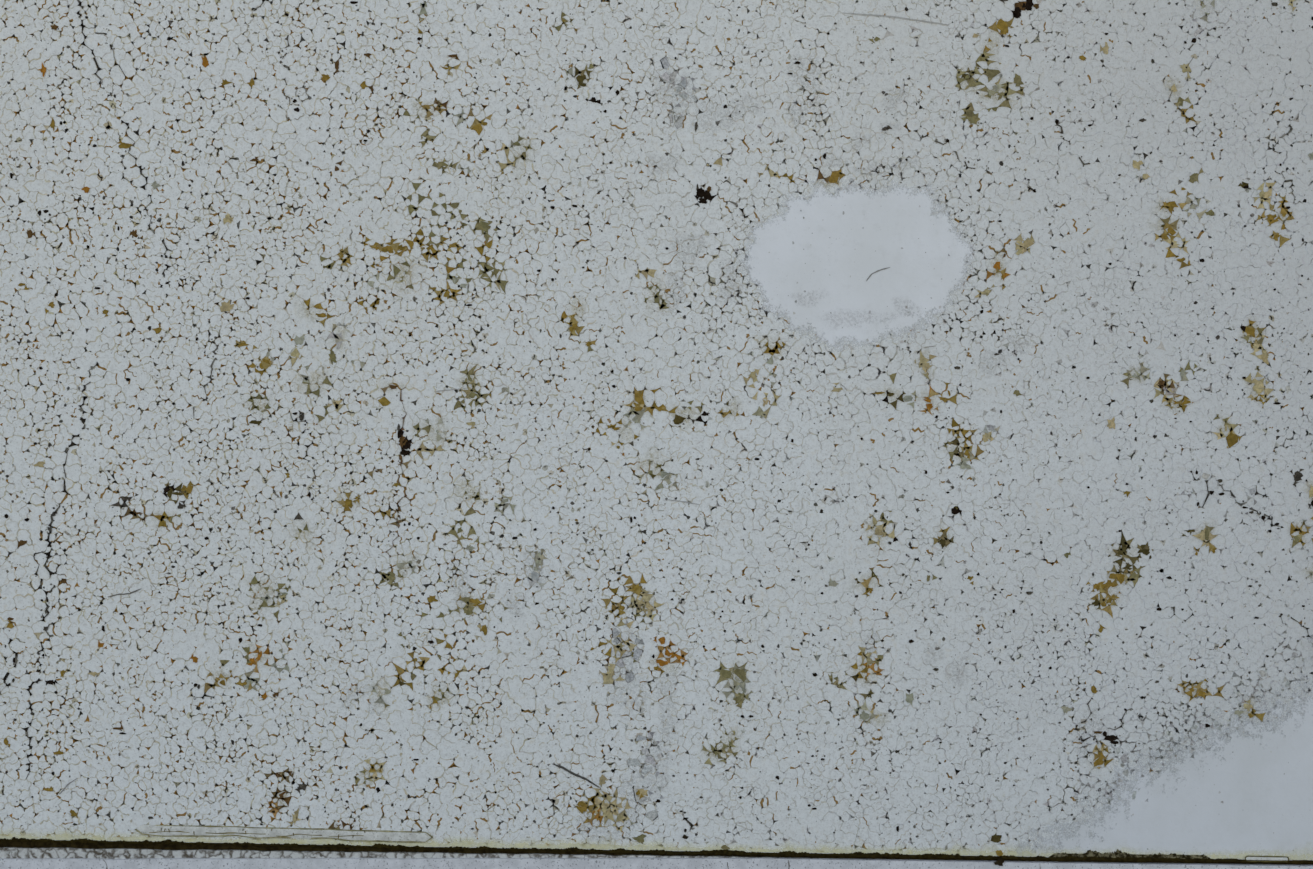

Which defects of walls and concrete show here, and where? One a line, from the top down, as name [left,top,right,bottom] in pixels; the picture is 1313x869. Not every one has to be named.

crack [279,36,309,104]
peeling [955,0,1039,126]
crack [77,0,177,297]
peeling [320,183,508,311]
peeling [1155,168,1215,269]
crack [193,341,219,416]
crack [1190,471,1284,529]
crack [3,362,98,779]
peeling [581,572,688,684]
peeling [1086,529,1153,633]
crack [1074,688,1136,755]
peeling [576,774,661,844]